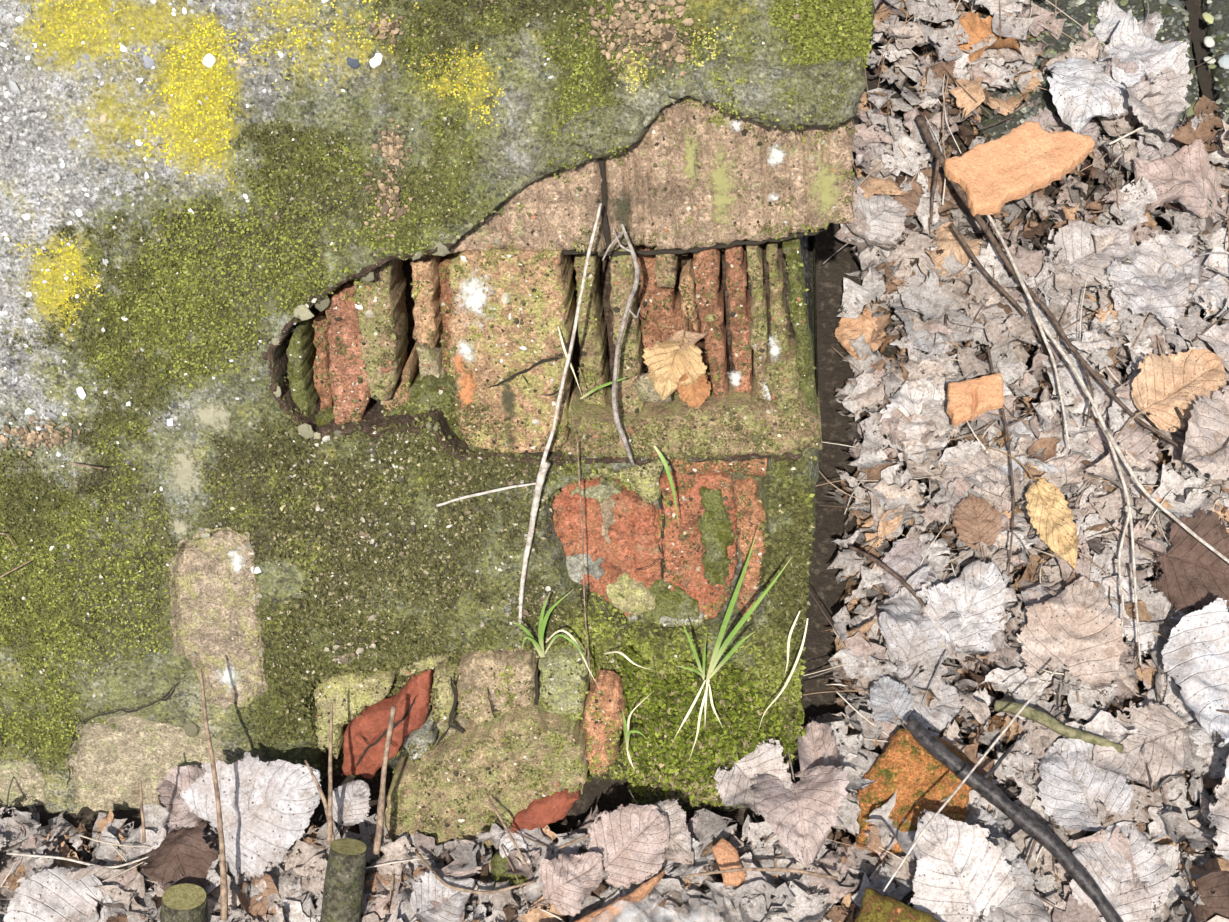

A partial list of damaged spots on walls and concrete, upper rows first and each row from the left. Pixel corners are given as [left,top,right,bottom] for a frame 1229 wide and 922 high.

spalling [262,229,802,622]
spalling [342,669,434,779]
spalling [509,789,580,833]